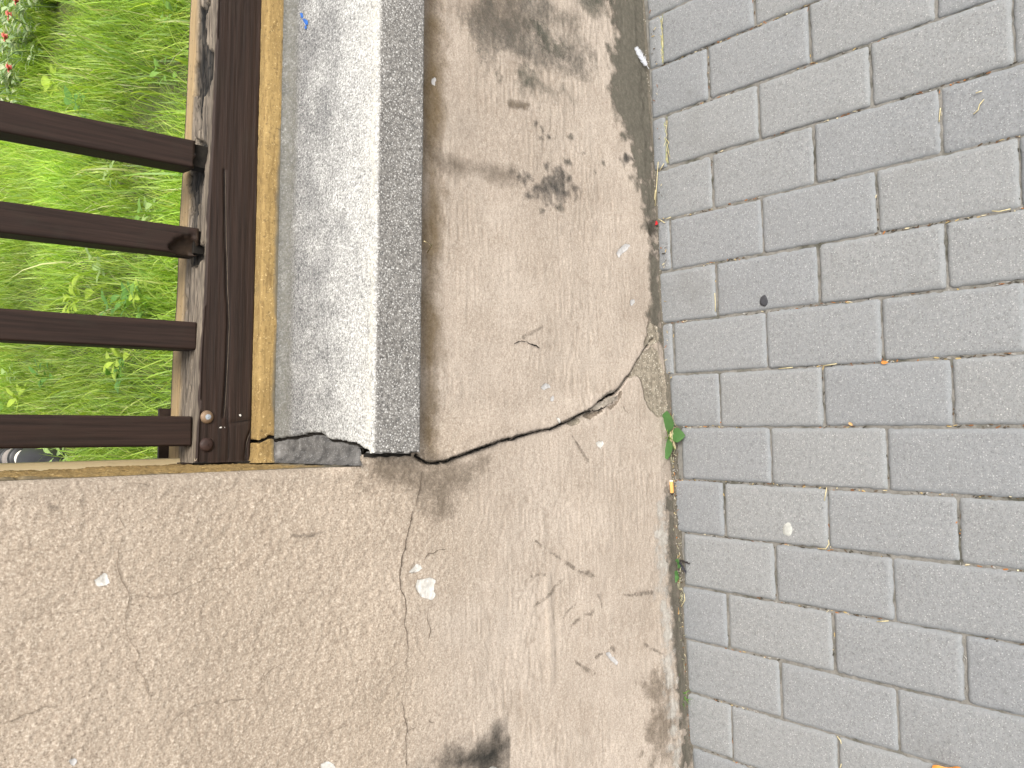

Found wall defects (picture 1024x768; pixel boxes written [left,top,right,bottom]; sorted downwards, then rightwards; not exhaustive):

water stain [471,0,583,71]
water stain [518,160,575,209]
crack [224,173,628,765]